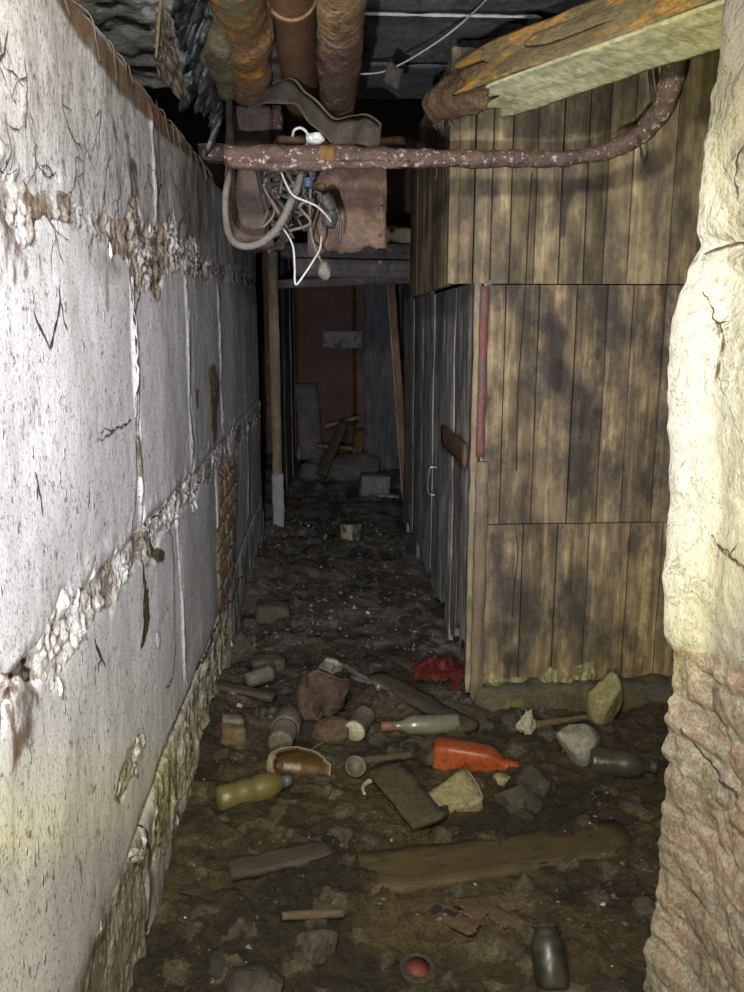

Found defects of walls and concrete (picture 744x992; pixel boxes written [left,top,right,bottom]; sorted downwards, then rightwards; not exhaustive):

crack [0,31,189,350]
flaking render [0,170,213,303]
crack [704,241,744,254]
rust [209,363,219,443]
crack [97,257,246,735]
flaking render [0,404,261,992]
crack [680,729,738,798]